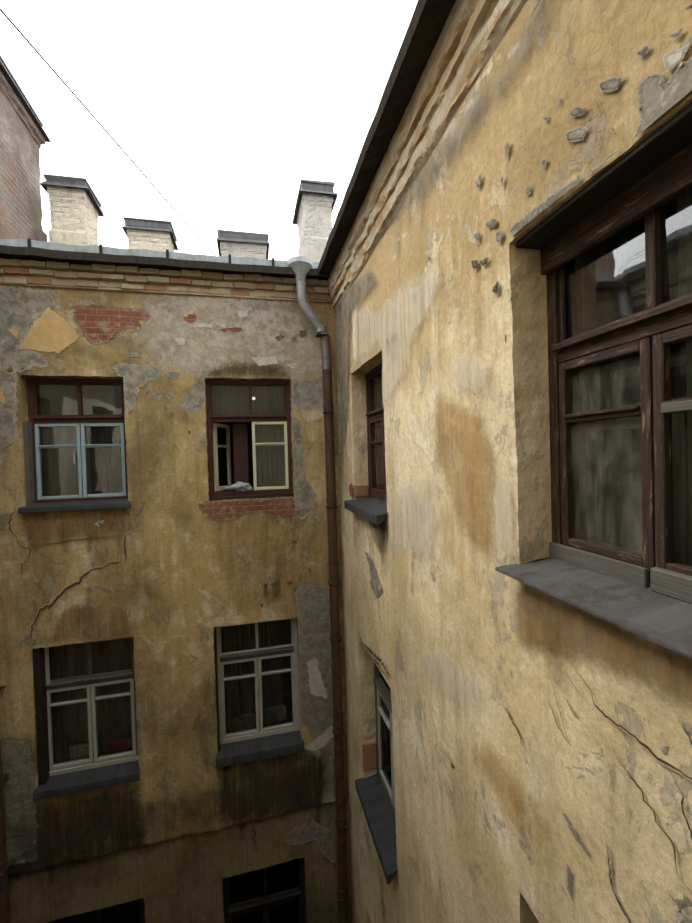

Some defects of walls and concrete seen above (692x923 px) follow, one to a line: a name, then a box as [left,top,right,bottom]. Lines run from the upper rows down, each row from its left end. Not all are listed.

flaking render [474,26,692,244]
flaking render [0,284,152,465]
flaking render [182,309,248,334]
flaking render [251,355,296,368]
spalling [197,379,323,521]
crack [8,505,127,649]
corrosion [0,745,10,923]
water stain [11,788,144,876]
water stain [220,752,325,821]
crack [546,663,692,895]
spalling [675,896,692,923]